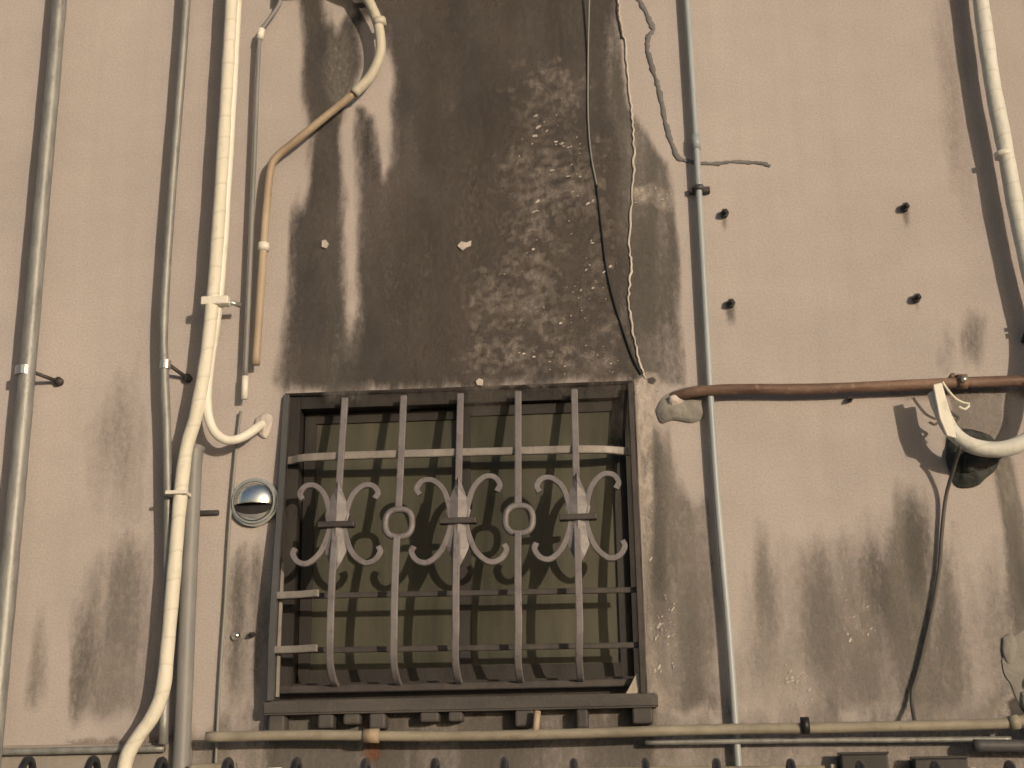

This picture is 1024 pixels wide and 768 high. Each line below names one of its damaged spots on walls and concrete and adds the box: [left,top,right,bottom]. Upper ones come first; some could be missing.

damp [613,56,680,379]
crack [616,0,771,378]
damp [326,320,364,399]
damp [645,434,715,709]
damp [695,735,734,766]
damp [884,507,1020,768]
damp [996,456,1024,633]